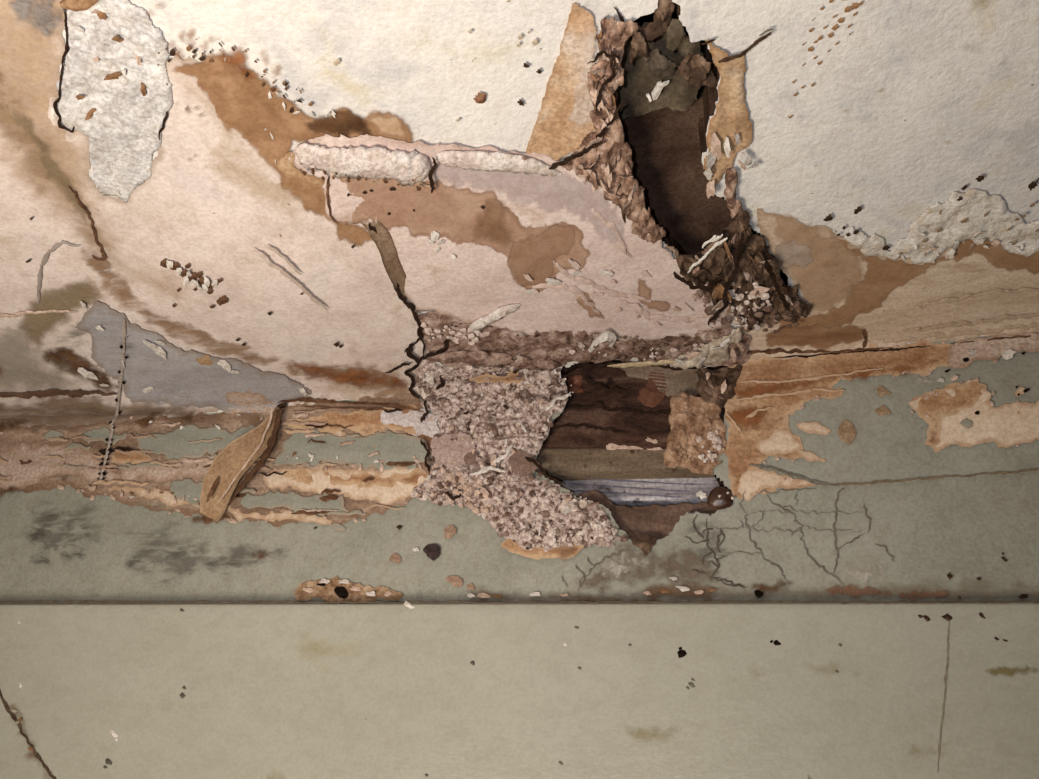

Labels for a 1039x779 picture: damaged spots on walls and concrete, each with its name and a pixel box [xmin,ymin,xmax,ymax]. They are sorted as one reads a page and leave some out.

rust [802,0,863,66]
water stain [157,34,412,246]
water stain [0,0,276,432]
peeling [0,0,1039,560]
crack [0,389,118,399]
water stain [287,363,408,397]
crack [278,283,451,412]
water stain [32,510,89,561]
mould [130,540,264,574]
crack [0,463,1039,604]
crack [0,690,56,779]